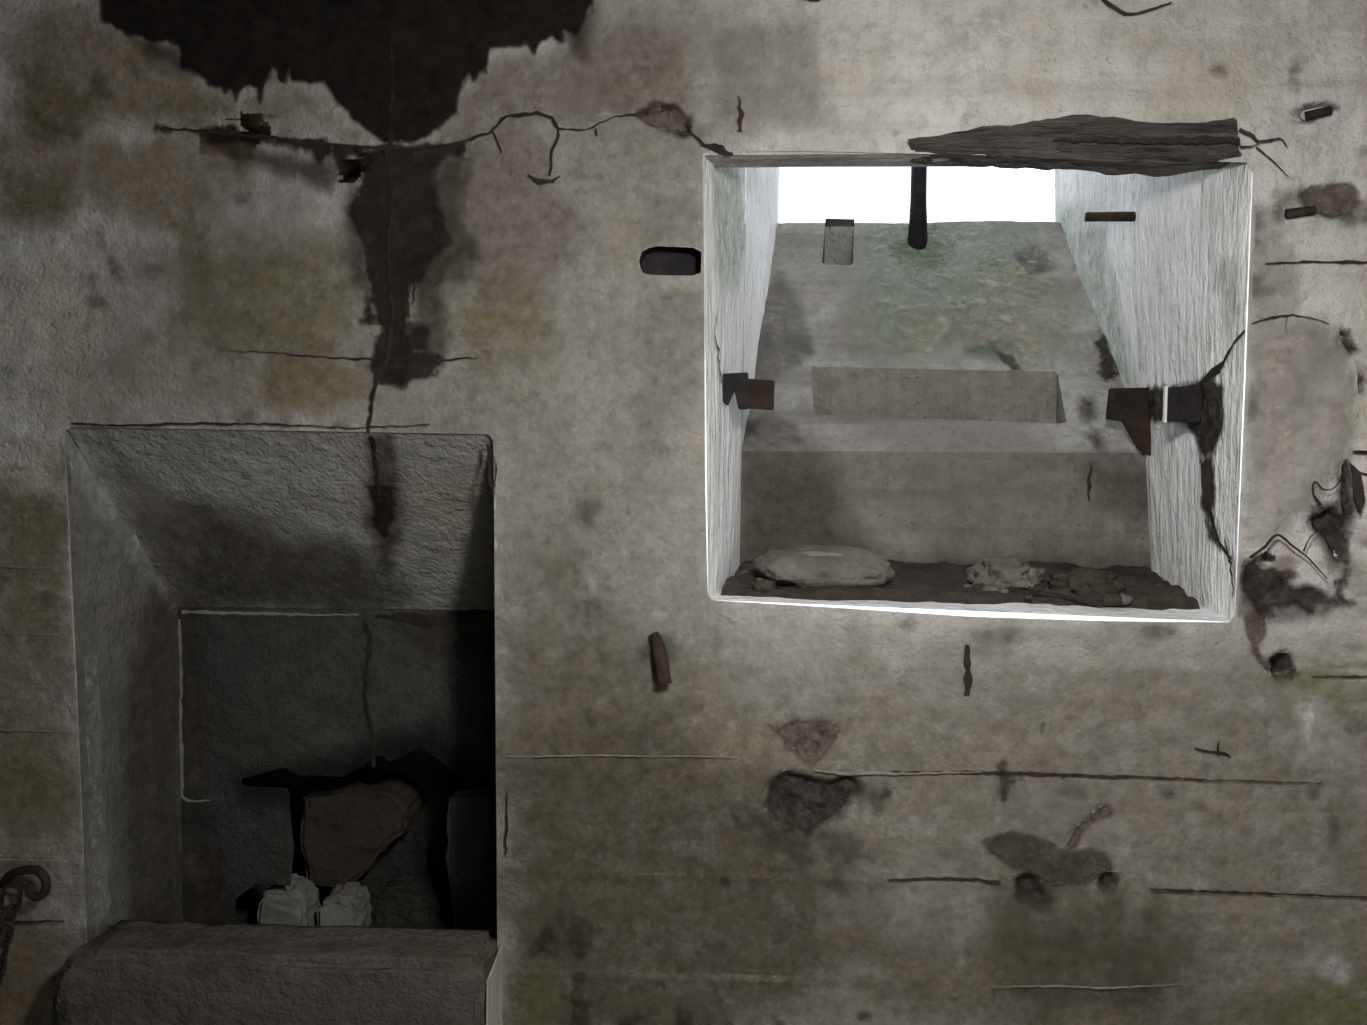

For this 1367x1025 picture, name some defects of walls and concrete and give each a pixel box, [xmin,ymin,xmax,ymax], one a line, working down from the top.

leakage [100,0,598,147]
crack [690,95,745,156]
crack [71,19,638,501]
leakage [137,130,1367,1025]
spalling [1147,375,1365,669]
spalling [736,720,891,862]
peeling [983,805,1180,1000]